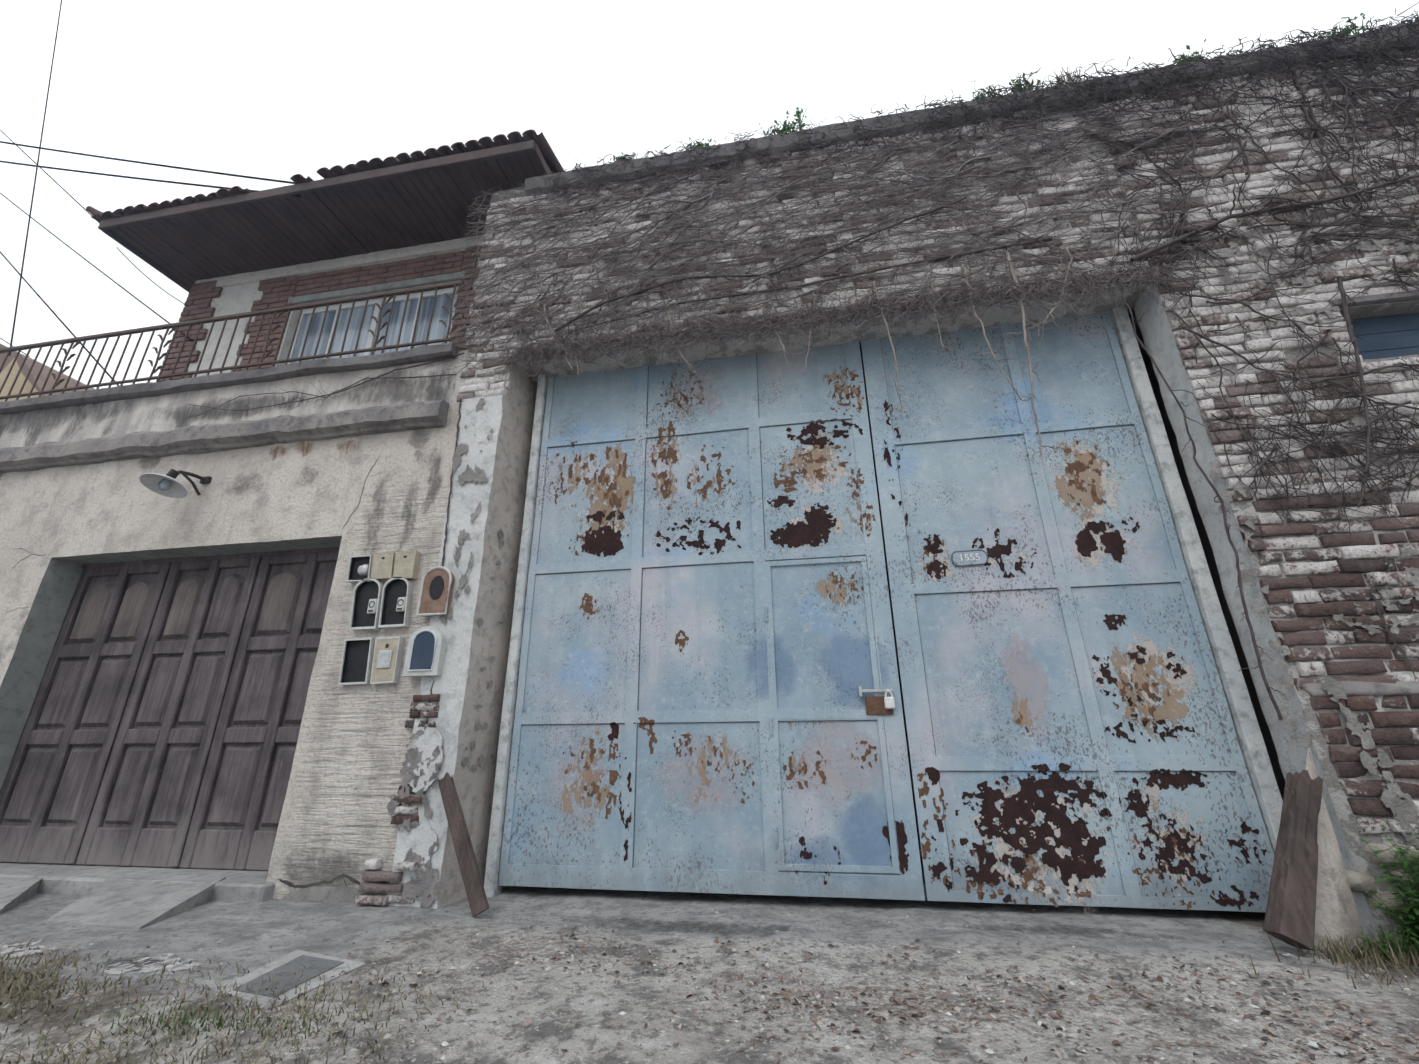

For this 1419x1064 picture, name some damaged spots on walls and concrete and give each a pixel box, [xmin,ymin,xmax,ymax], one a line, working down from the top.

rust [550,441,634,557]
rust [651,368,737,510]
rust [767,367,877,548]
rust [917,532,953,583]
rust [972,528,1037,579]
rust [1049,433,1140,569]
rust [1092,614,1197,743]
peeling [281,694,443,909]
rust [562,722,621,822]
rust [672,730,759,804]
rust [917,763,1221,911]